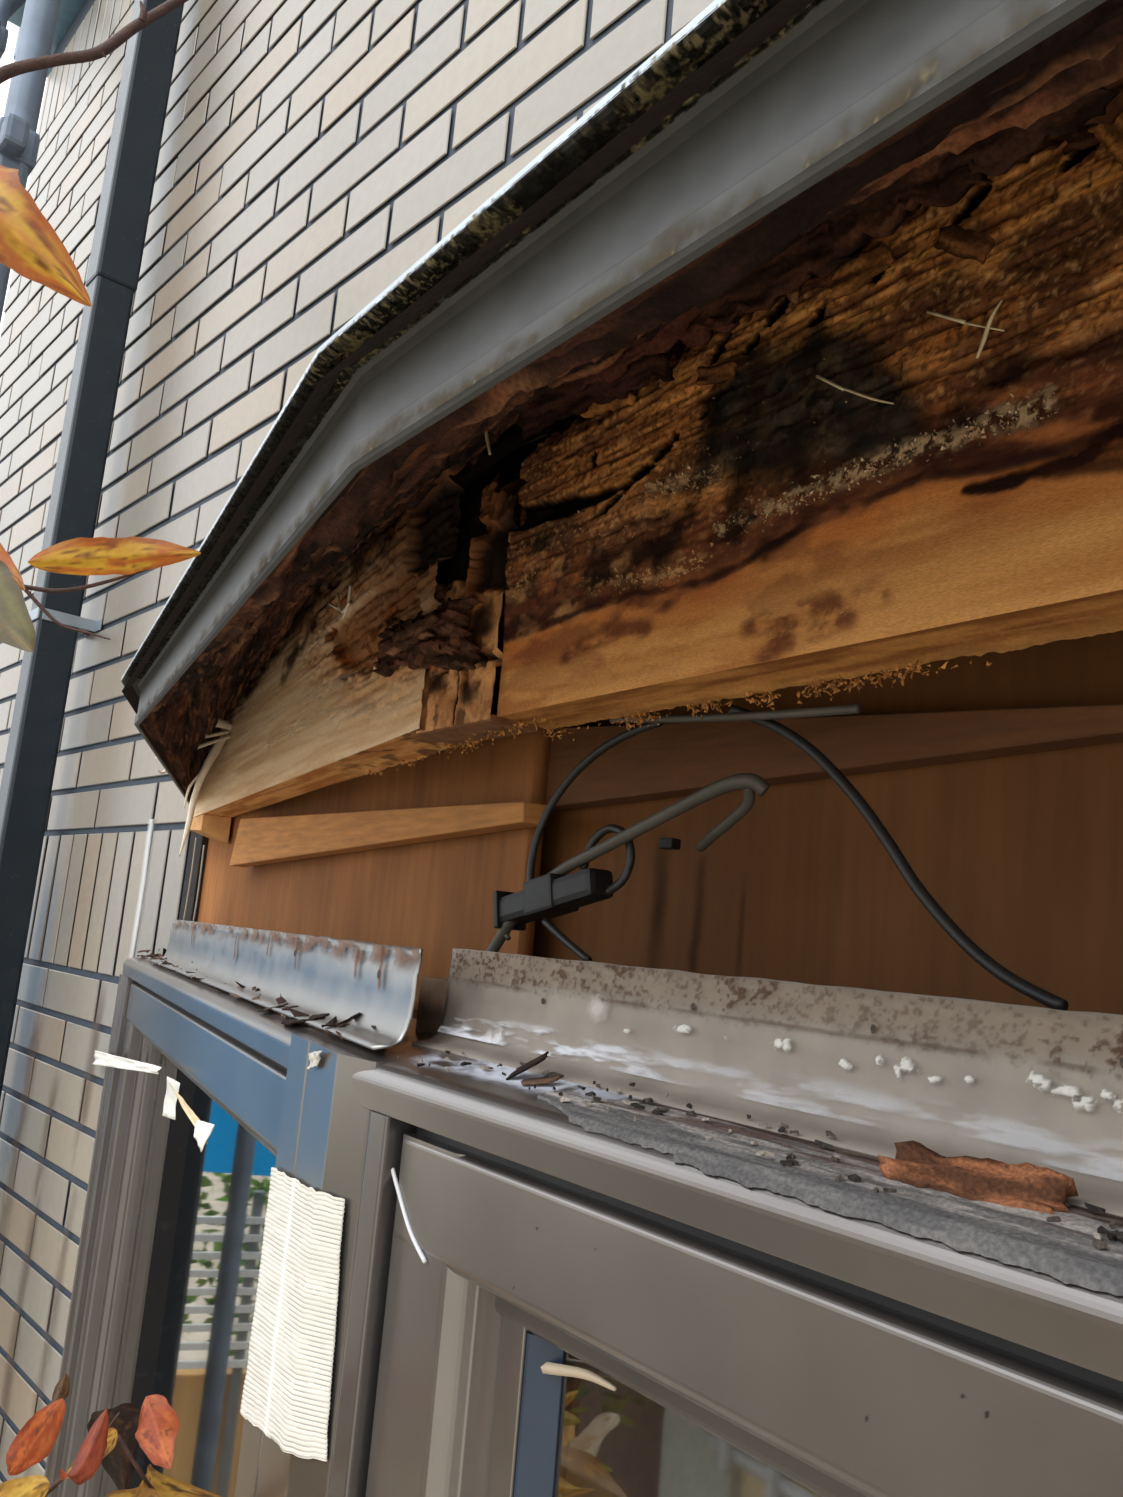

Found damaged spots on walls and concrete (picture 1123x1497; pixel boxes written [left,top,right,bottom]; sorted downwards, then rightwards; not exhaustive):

peeling [933,224,995,265]
peeling [830,244,895,300]
peeling [580,390,636,418]
leakage [470,331,1123,643]
leakage [757,618,792,663]
leakage [429,675,442,691]
leakage [461,681,473,703]
rust [174,920,420,989]
peeling [774,1038,790,1052]
peeling [506,1051,563,1086]
peeling [875,1055,940,1083]
peeling [1027,1071,1123,1114]